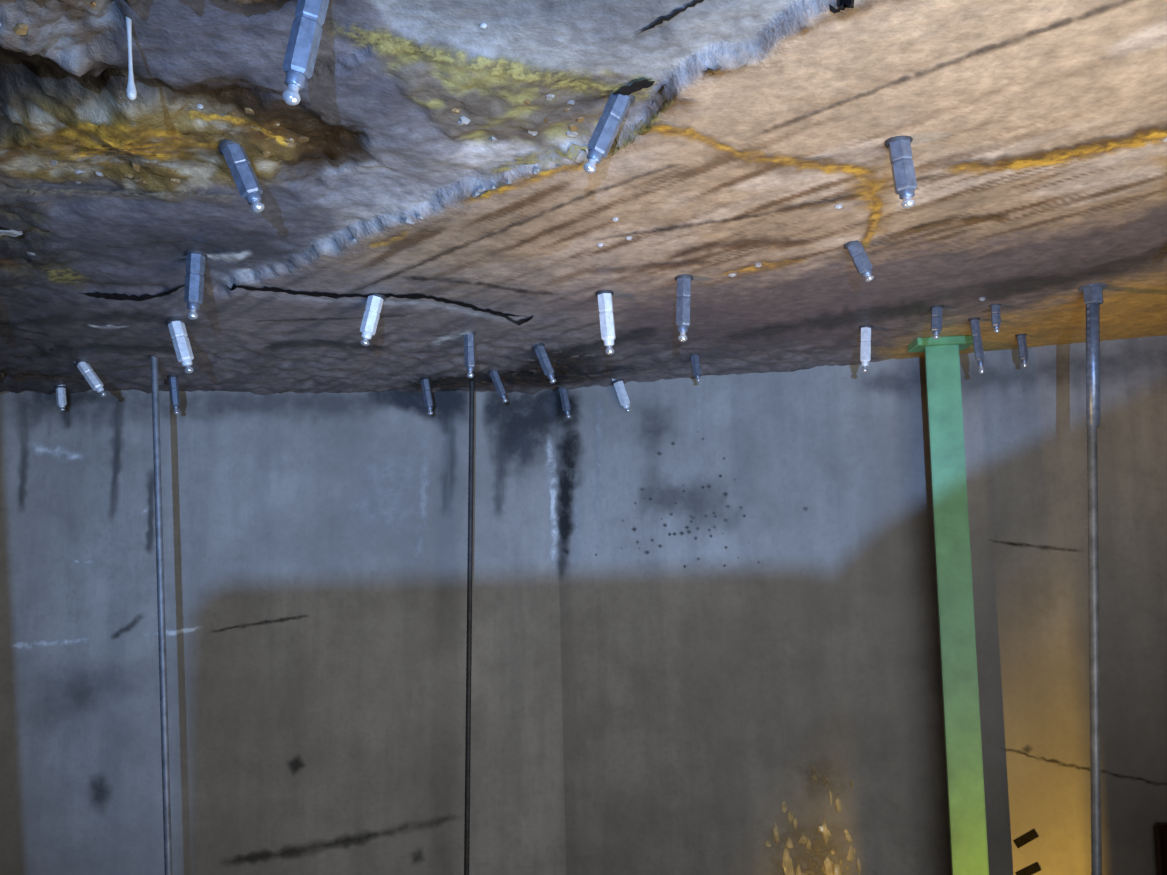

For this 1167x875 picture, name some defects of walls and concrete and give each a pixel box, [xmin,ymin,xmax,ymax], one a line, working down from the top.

crack [636,0,704,35]
crack [829,0,854,13]
spalling [0,0,889,303]
damp [207,252,249,261]
crack [226,277,551,325]
damp [32,444,82,460]
damp [374,330,654,565]